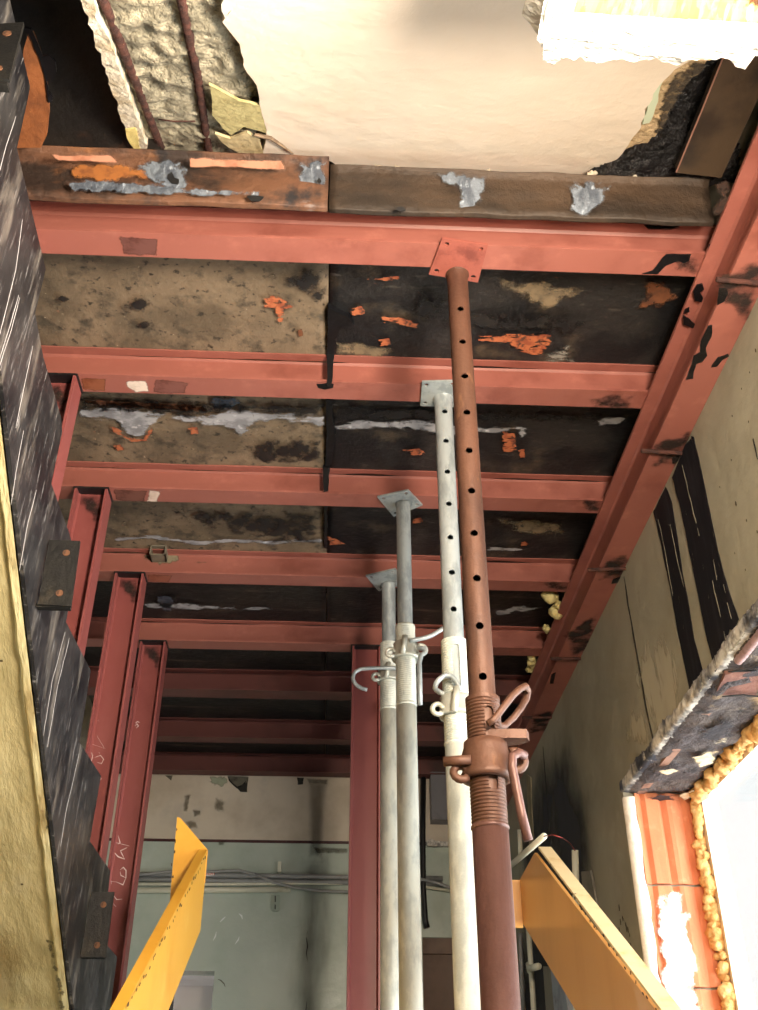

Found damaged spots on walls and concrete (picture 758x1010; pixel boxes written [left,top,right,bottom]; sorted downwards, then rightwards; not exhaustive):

spalling [94,0,293,154]
spalling [625,59,711,150]
rust [72,164,148,181]
rust [640,282,676,308]